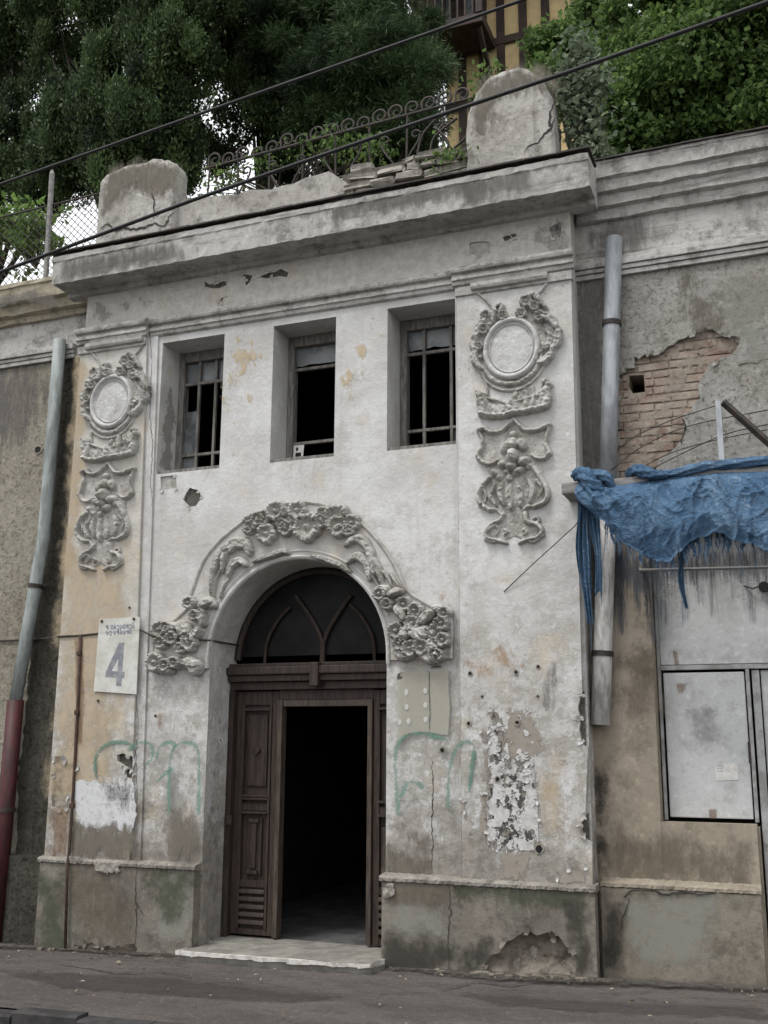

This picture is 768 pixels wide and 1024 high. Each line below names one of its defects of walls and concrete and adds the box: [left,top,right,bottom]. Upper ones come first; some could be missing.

crack [524,92,557,152]
crack [101,195,178,231]
spalling [241,269,288,285]
peeling [159,388,203,510]
spalling [617,328,740,478]
water stain [49,359,123,795]
water stain [614,545,662,639]
spalling [120,754,133,779]
peeling [478,707,544,854]
crack [431,761,544,990]
spalling [476,925,578,977]
crack [619,889,716,934]